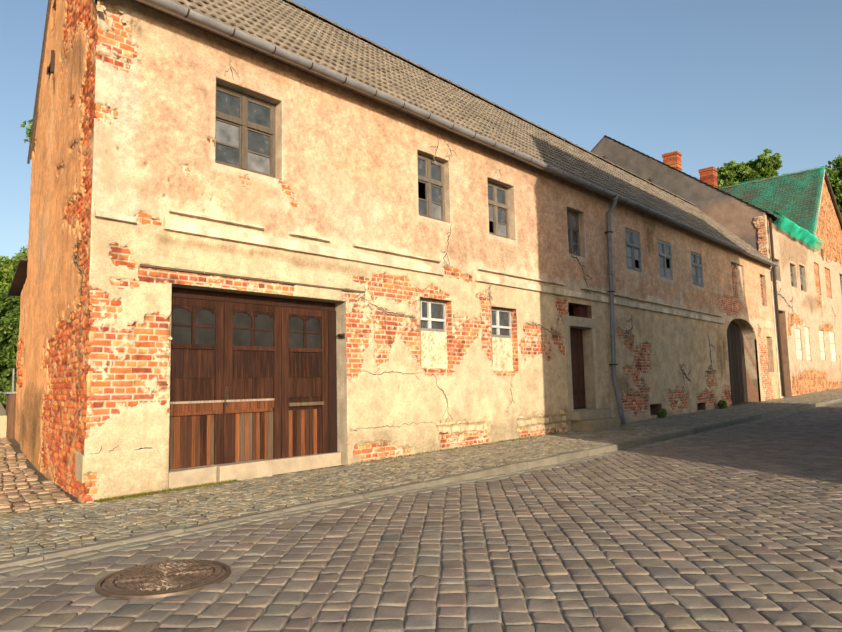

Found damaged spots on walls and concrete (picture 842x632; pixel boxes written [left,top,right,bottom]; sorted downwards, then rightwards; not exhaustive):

crack [70,238,83,309]
spalling [40,0,295,503]
crack [442,222,452,270]
spalling [443,266,473,283]
spalling [353,441,412,461]
crack [347,368,453,445]
spalling [342,272,518,379]
flaking render [436,417,489,449]
spalling [519,298,568,362]
spalling [615,326,651,416]
spalling [758,325,774,401]
spalling [791,369,842,395]